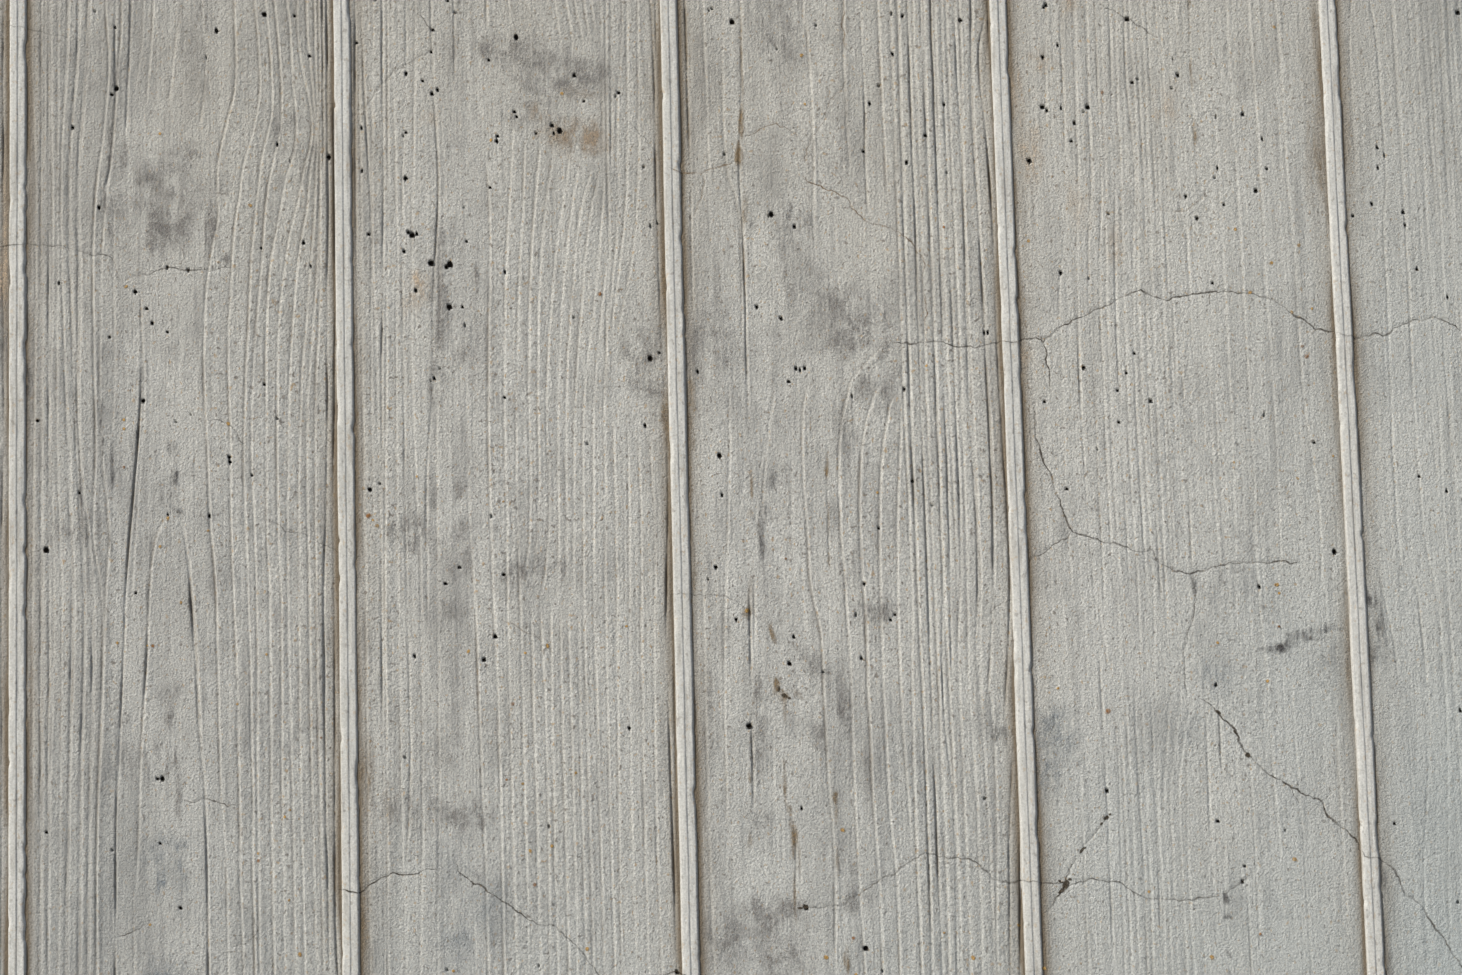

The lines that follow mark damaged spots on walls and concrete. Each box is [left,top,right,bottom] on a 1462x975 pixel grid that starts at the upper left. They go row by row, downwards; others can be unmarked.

crack [894,289,1254,384]
crack [1037,441,1126,555]
crack [1184,682,1243,748]
crack [1268,774,1359,849]
crack [343,869,533,921]